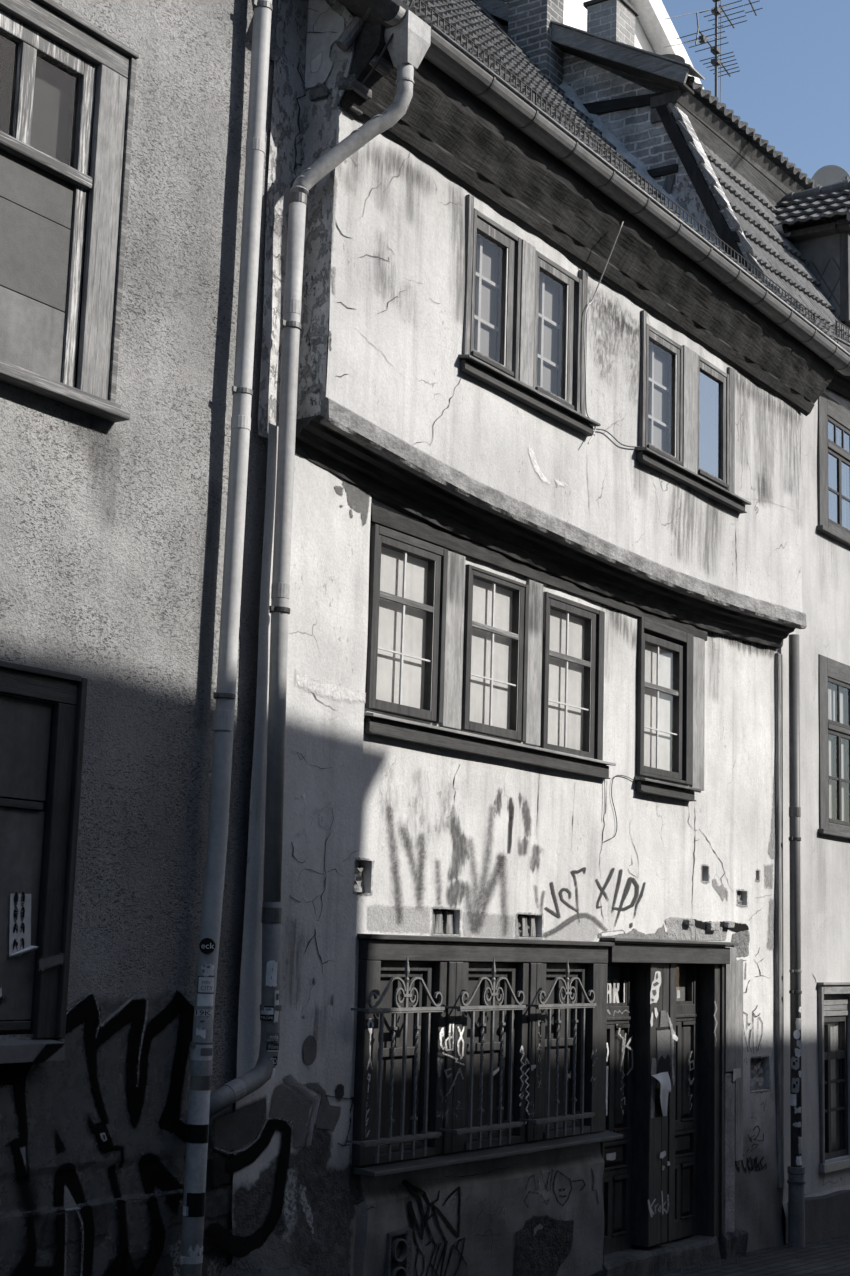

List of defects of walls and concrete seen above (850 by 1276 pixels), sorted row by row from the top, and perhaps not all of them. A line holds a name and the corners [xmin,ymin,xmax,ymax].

crack [334,154,439,377]
peeling [335,479,370,526]
crack [290,810,356,977]
peeling [232,1125,362,1276]
spalling [513,1215,574,1276]